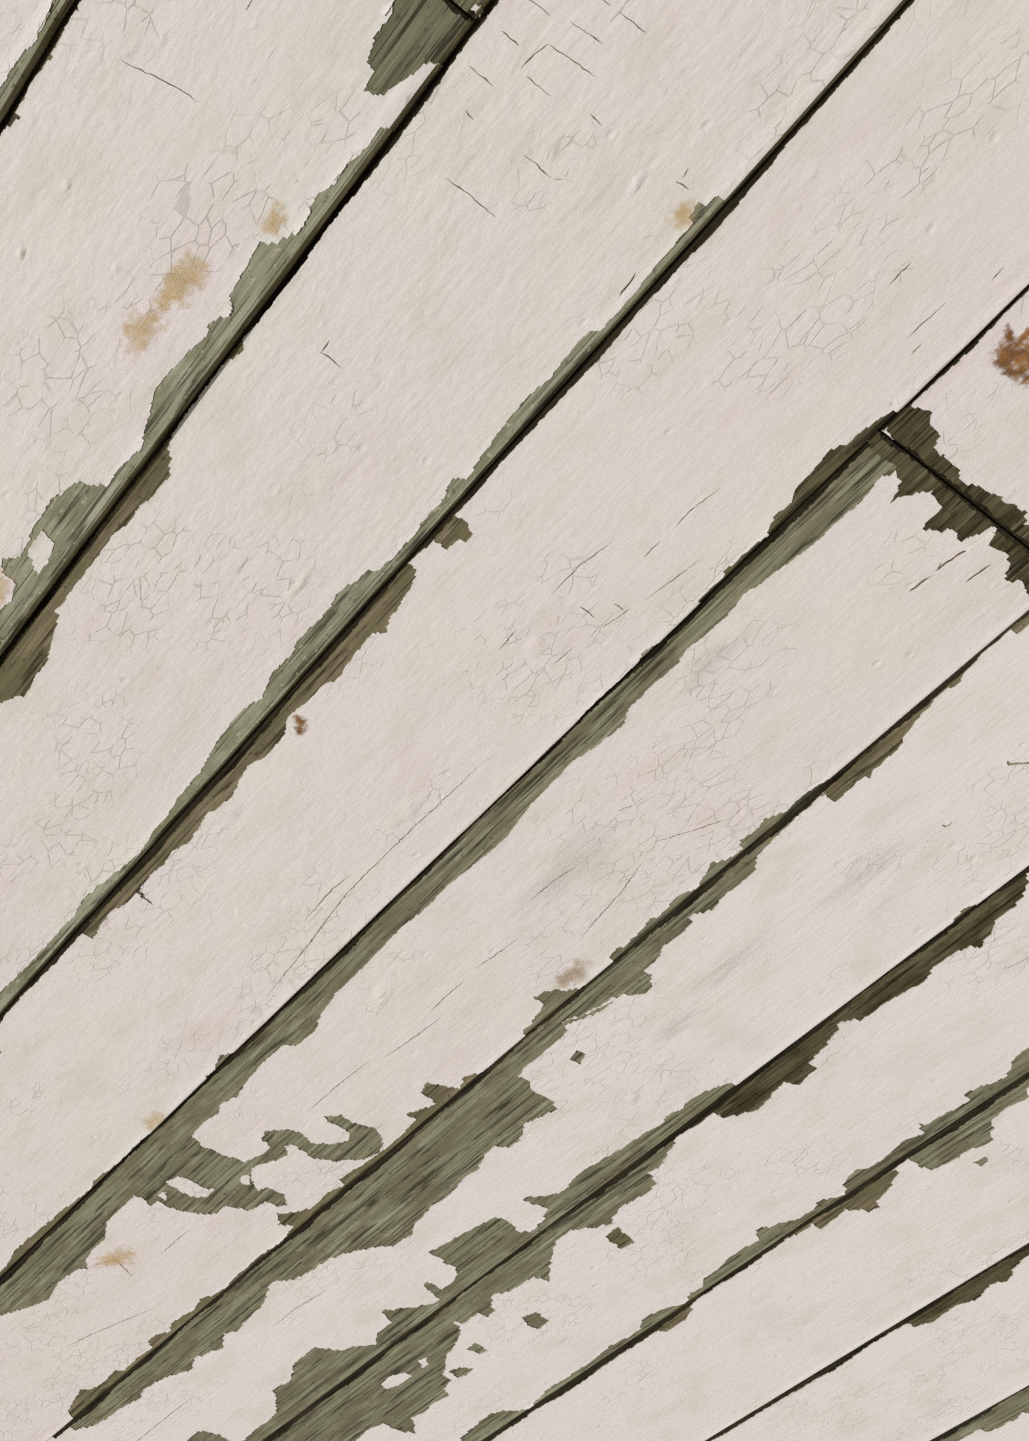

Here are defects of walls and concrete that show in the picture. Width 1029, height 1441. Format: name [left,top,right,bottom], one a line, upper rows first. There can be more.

crack [121,60,197,102]
peeling [364,0,491,95]
rust [994,325,1029,384]
peeling [0,127,726,1014]
peeling [0,406,1029,1441]